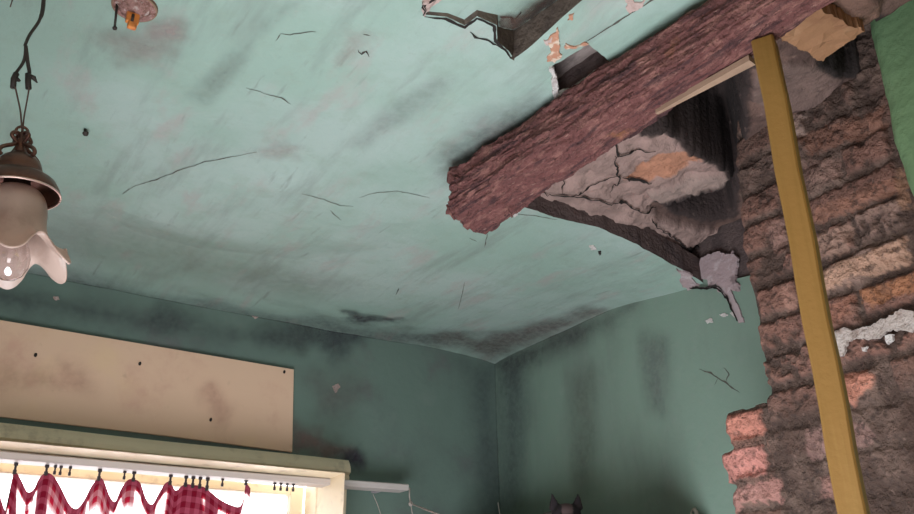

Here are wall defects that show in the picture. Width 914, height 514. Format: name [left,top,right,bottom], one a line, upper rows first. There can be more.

flaking render [421,0,441,17]
flaking render [544,27,597,99]
crack [123,152,255,194]
flaking render [781,4,914,514]
water stain [352,313,392,322]
flaking render [676,121,837,514]
crack [700,368,739,392]